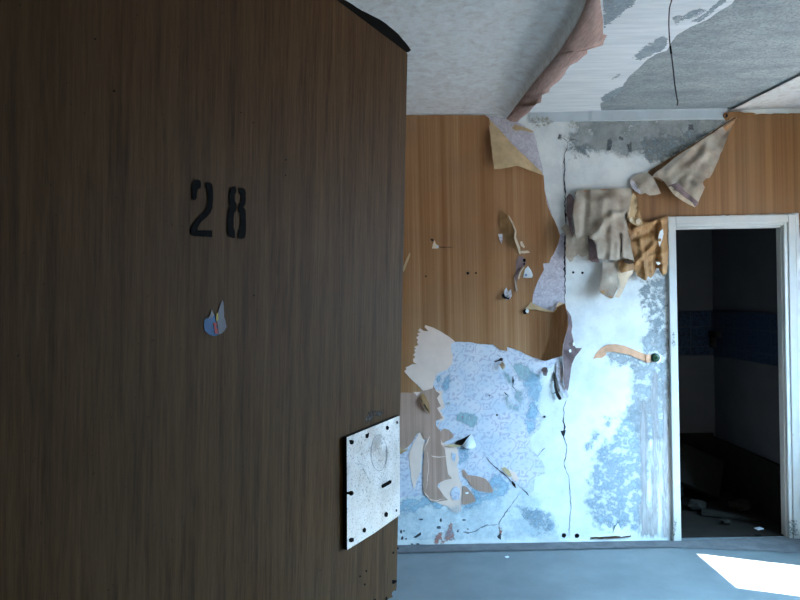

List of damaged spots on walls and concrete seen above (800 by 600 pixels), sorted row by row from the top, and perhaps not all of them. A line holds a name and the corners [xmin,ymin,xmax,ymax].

flaking render [530,0,734,112]
peeling [489,119,543,175]
crack [559,137,577,301]
peeling [523,302,564,314]
peeling [561,114,736,440]
peeling [541,360,569,400]
crack [464,457,529,540]
crack [561,402,572,529]
flaking render [560,521,631,542]
leakage [585,372,669,537]